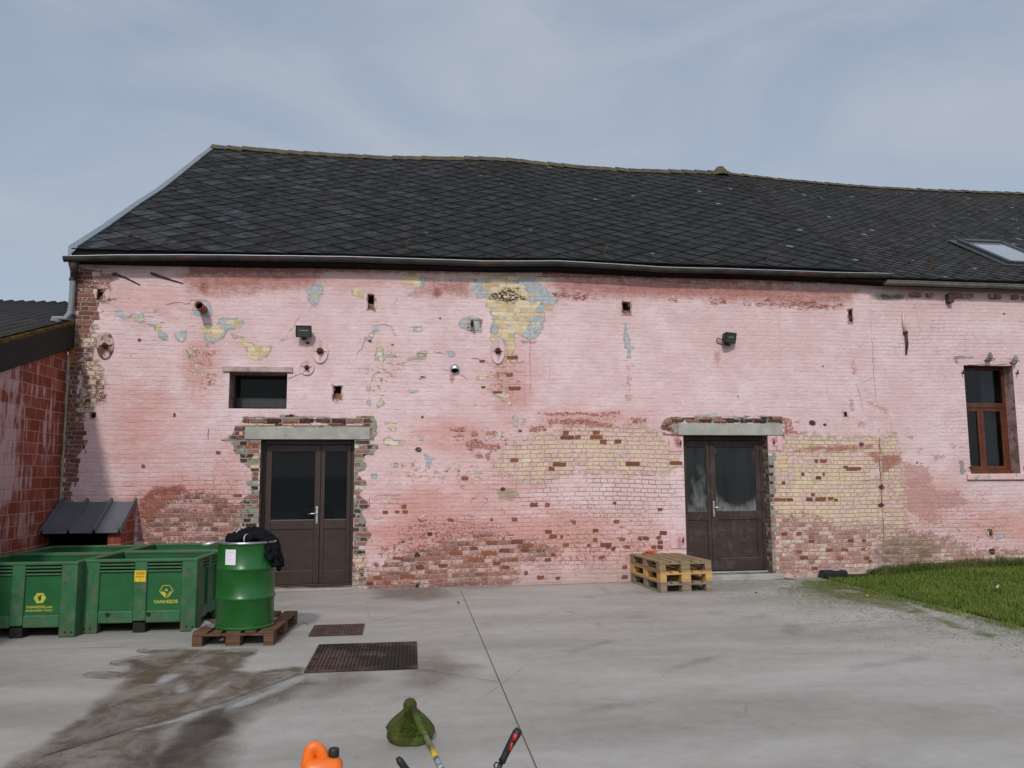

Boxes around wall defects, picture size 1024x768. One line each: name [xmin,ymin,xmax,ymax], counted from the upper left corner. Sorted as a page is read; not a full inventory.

flaking render [59,265,285,502]
peeling [351,286,427,408]
flaking render [371,271,684,491]
flaking render [366,502,667,589]
flaking render [770,399,1024,577]